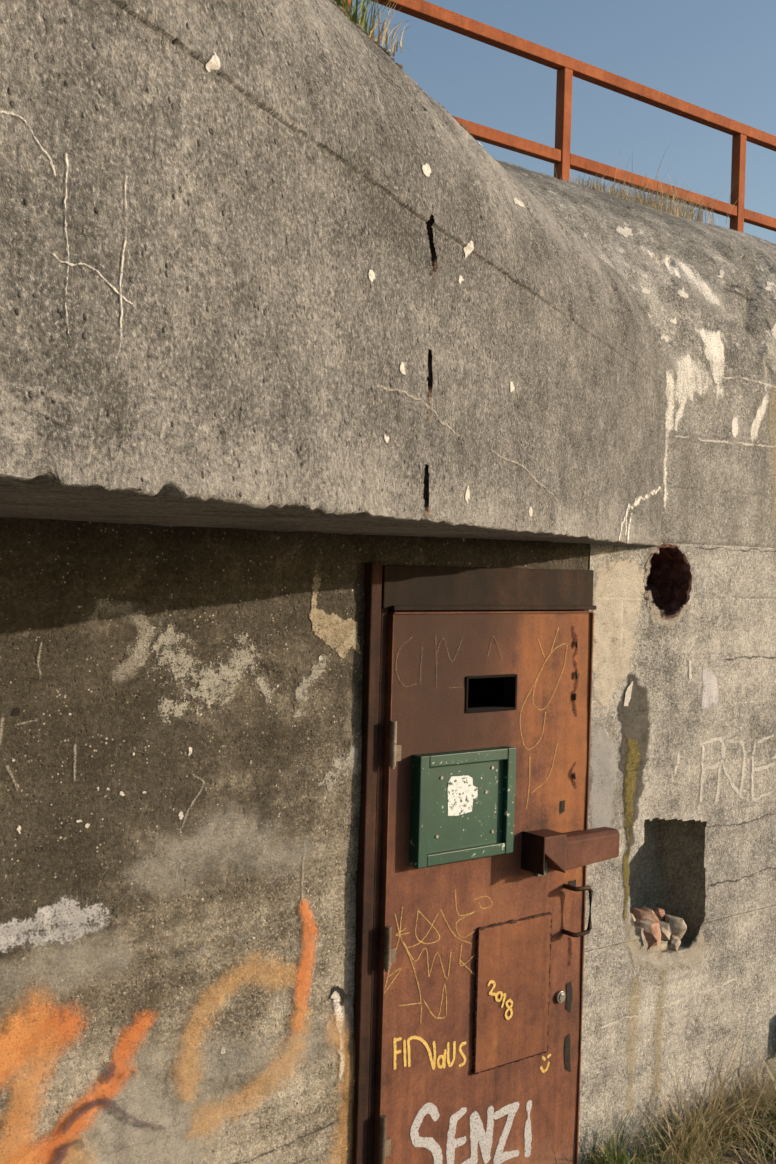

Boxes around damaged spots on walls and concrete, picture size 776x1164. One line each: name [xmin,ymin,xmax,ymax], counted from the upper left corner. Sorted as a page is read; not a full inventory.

water stain [732,366,769,443]
spalling [643,547,692,626]
peeling [293,574,361,719]
spalling [624,905,709,973]
crack [232,1116,347,1164]